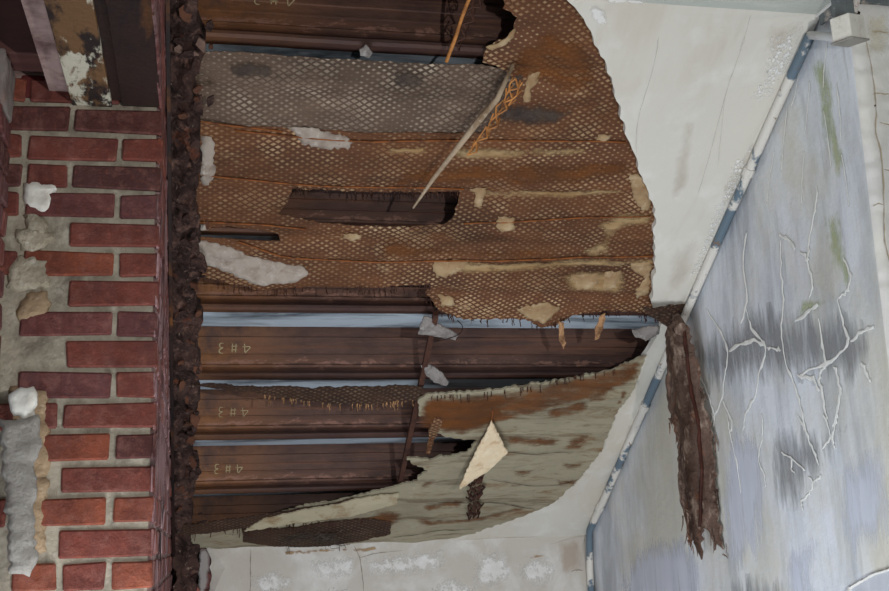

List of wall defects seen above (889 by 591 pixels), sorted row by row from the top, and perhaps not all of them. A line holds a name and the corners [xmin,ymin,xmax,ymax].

corrosion [516,37,594,89]
crack [866,30,889,258]
damp [708,315,864,376]
crack [700,188,874,510]
corrosion [420,363,638,434]
damp [725,439,761,560]
damp [780,445,817,492]
damp [630,543,698,591]